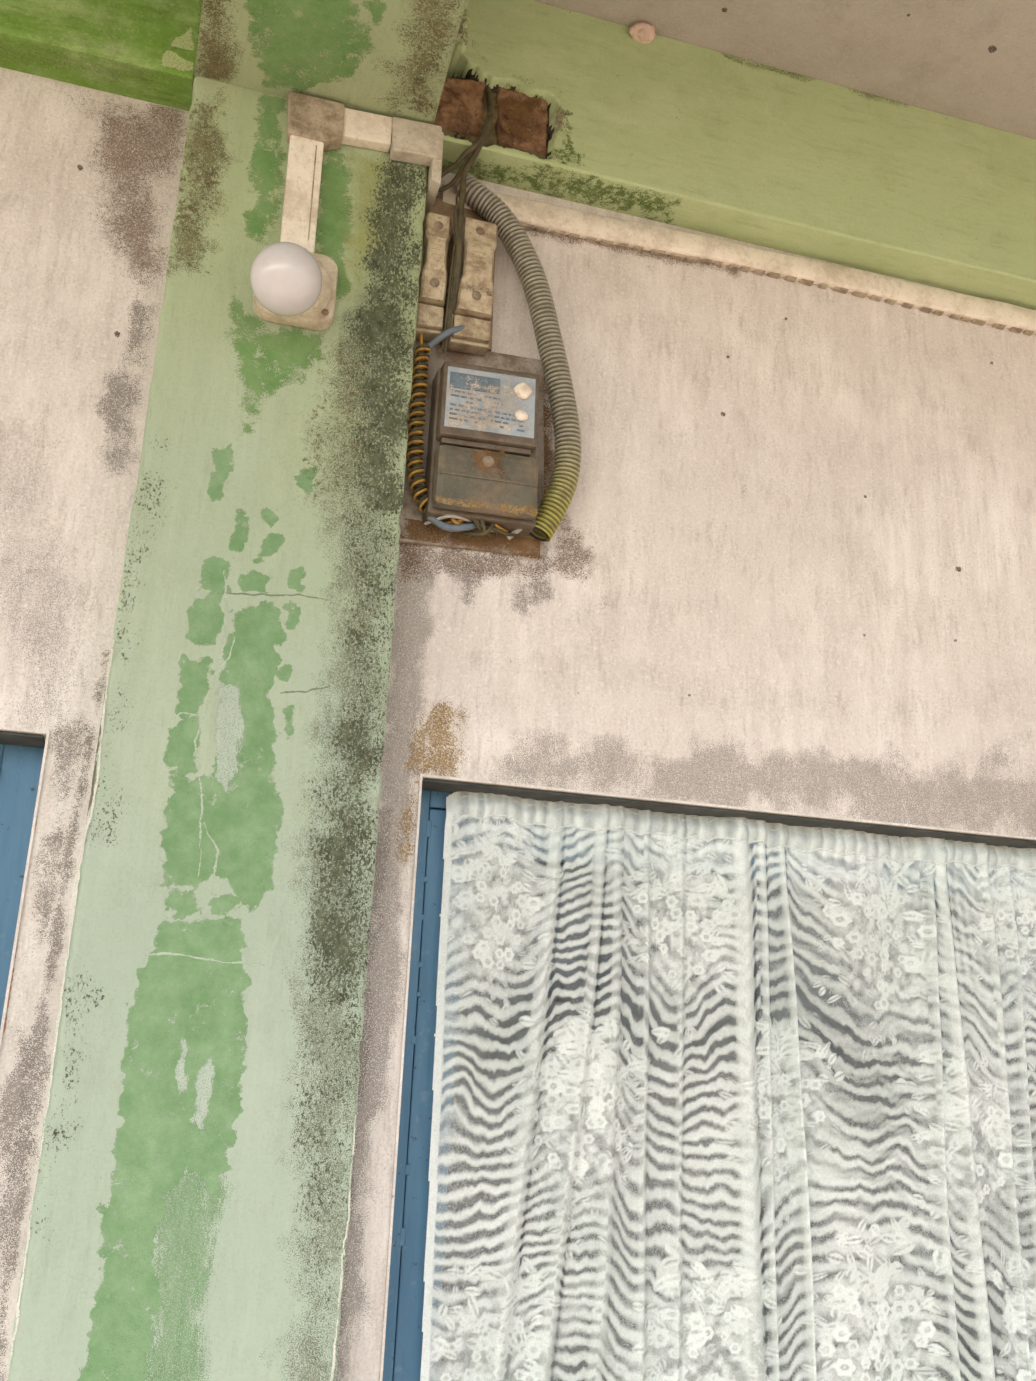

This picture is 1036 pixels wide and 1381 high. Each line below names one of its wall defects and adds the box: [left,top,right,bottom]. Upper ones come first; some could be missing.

peeling [243,0,387,246]
peeling [314,148,357,303]
damp [373,0,467,119]
spalling [433,75,567,159]
peeling [207,285,331,502]
damp [0,0,249,1381]
crack [172,570,330,877]
damp [259,151,490,1381]
rust [391,695,480,866]
damp [490,726,1036,837]
peeling [77,508,306,1381]
crack [145,952,266,966]